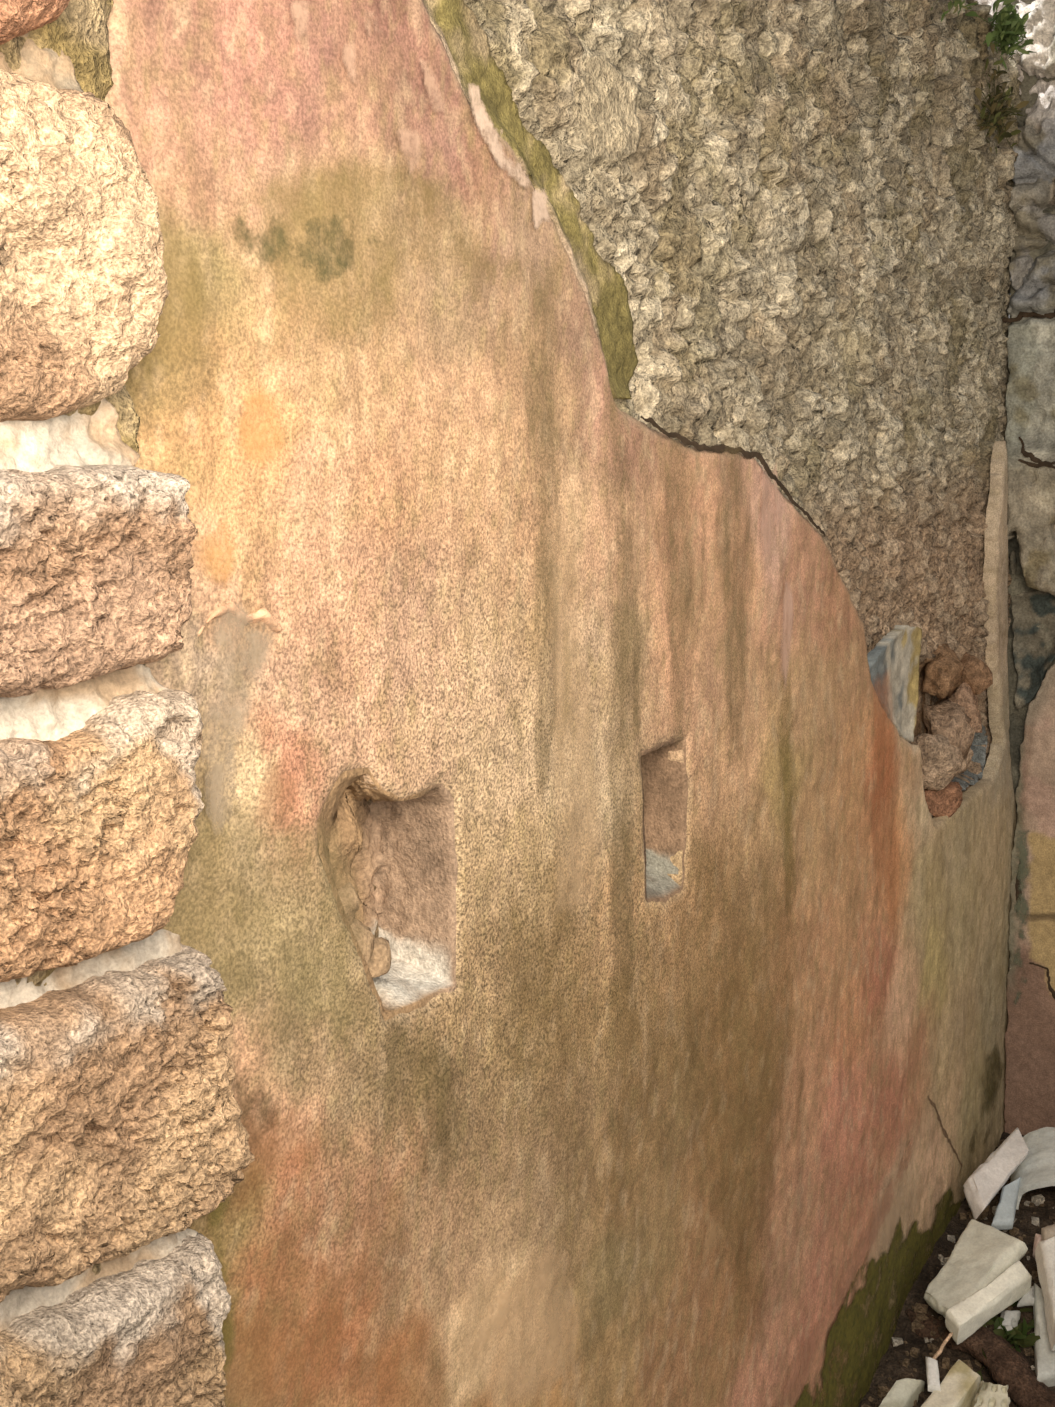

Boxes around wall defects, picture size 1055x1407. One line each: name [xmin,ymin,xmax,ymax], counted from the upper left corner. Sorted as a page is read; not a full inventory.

peeling [291,1,308,39]
peeling [343,45,355,78]
peeling [420,60,443,111]
peeling [399,130,420,170]
spalling [464,0,1055,818]
crack [1018,436,1055,469]
spalling [317,767,458,1021]
crack [1029,962,1055,999]